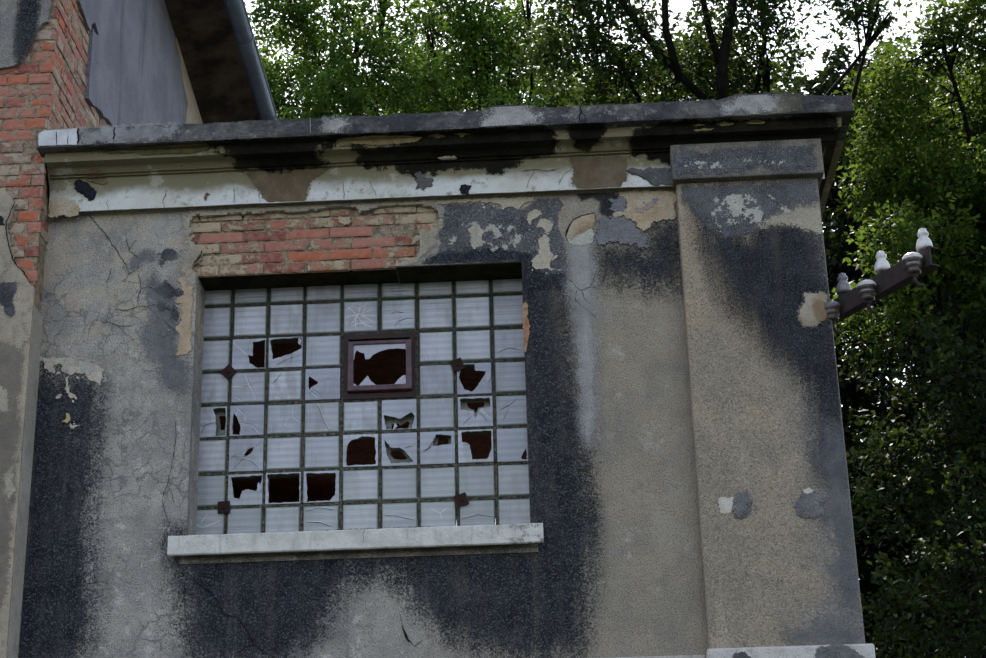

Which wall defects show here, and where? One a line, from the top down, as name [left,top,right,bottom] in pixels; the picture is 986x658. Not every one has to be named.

spalling [0,0,110,306]
crack [89,200,175,343]
spalling [168,171,562,356]
peeling [595,166,677,252]
peeling [711,194,822,234]
peeling [0,385,11,413]
peeling [40,353,107,434]
damp [160,113,865,658]
damp [0,342,24,608]
damp [18,361,113,658]
peeling [718,497,734,514]